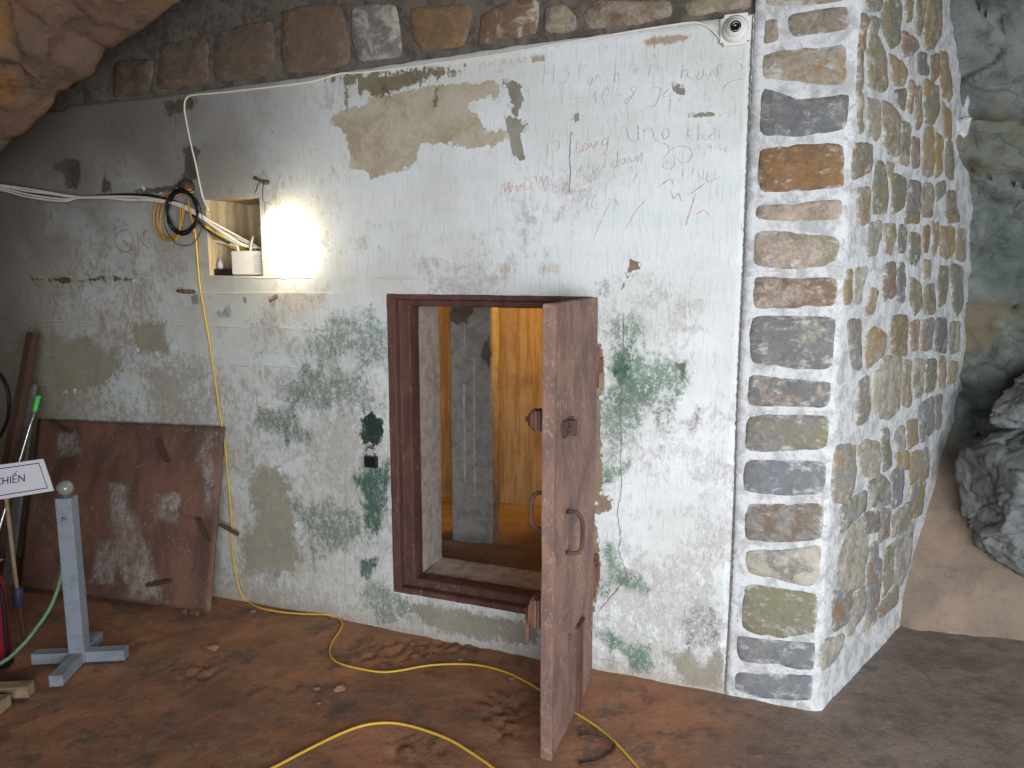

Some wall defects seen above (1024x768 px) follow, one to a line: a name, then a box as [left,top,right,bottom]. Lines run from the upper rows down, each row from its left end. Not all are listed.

peeling [330,78,530,180]
spalling [621,259,643,290]
damp [257,400,310,442]
damp [359,409,384,446]
damp [353,462,390,534]
spalling [593,341,614,612]
crack [599,319,631,611]